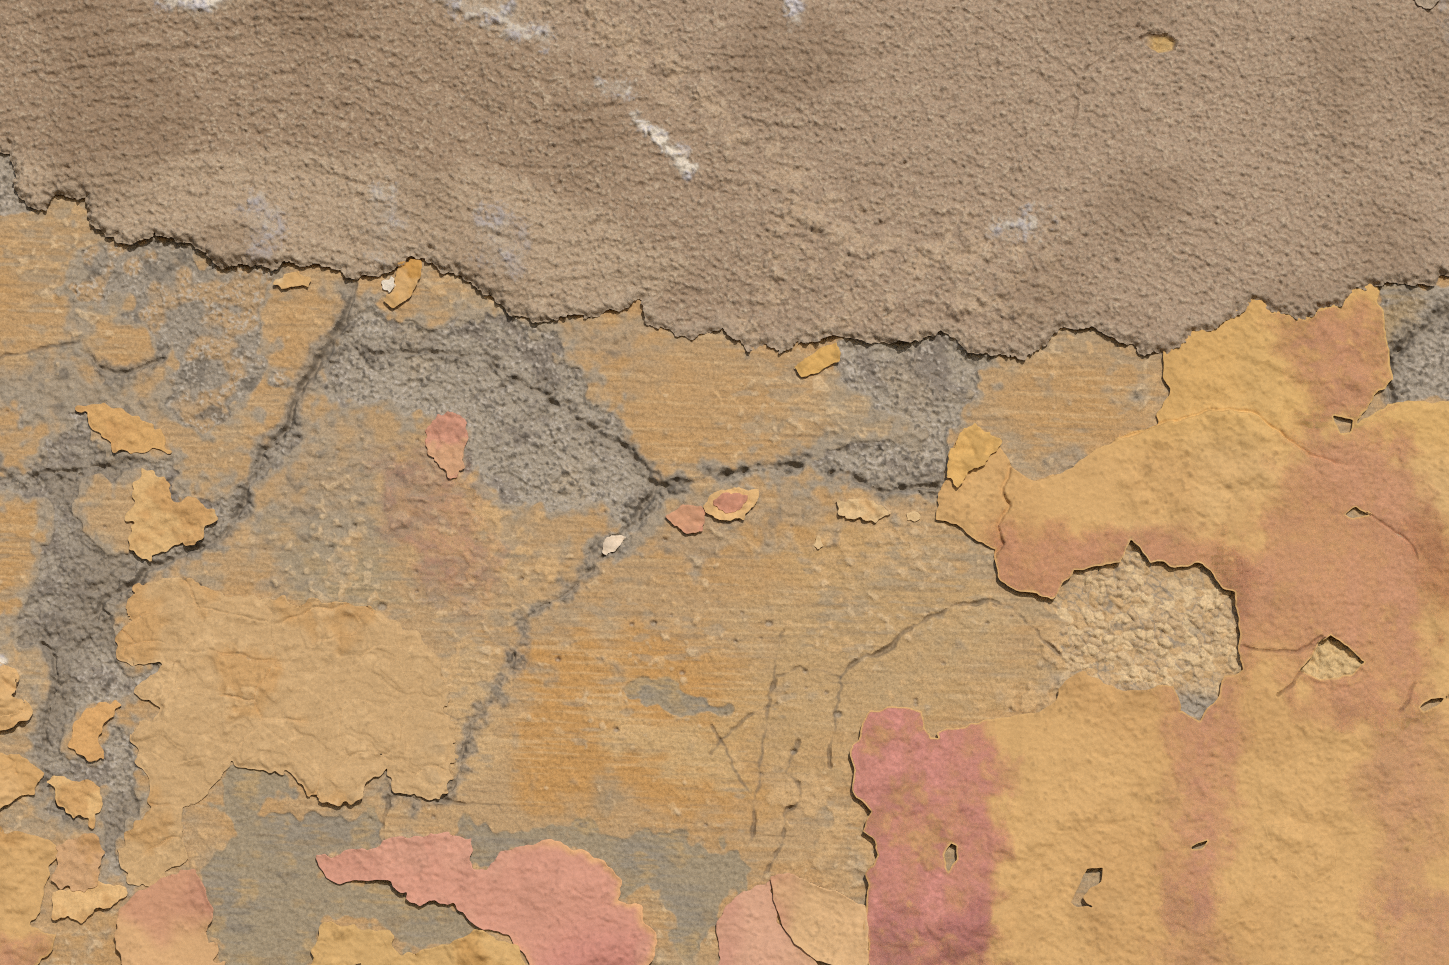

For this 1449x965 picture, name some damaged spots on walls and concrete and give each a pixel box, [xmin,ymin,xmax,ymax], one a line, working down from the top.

efflorescence [156,0,222,12]
efflorescence [447,0,550,41]
efflorescence [784,0,804,21]
peeling [0,152,34,217]
crack [0,340,167,378]
crack [0,460,136,482]
crack [40,282,939,840]
peeling [0,237,1449,965]
crack [709,598,1062,881]